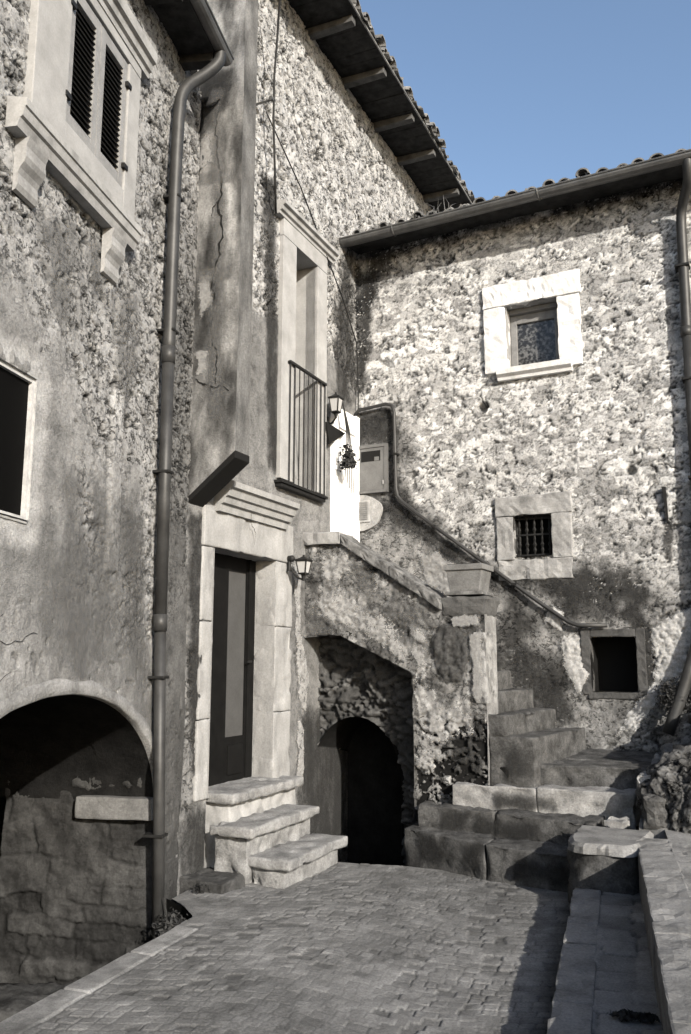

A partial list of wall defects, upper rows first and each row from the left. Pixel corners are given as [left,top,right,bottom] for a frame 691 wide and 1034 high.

crack [196,110,229,395]